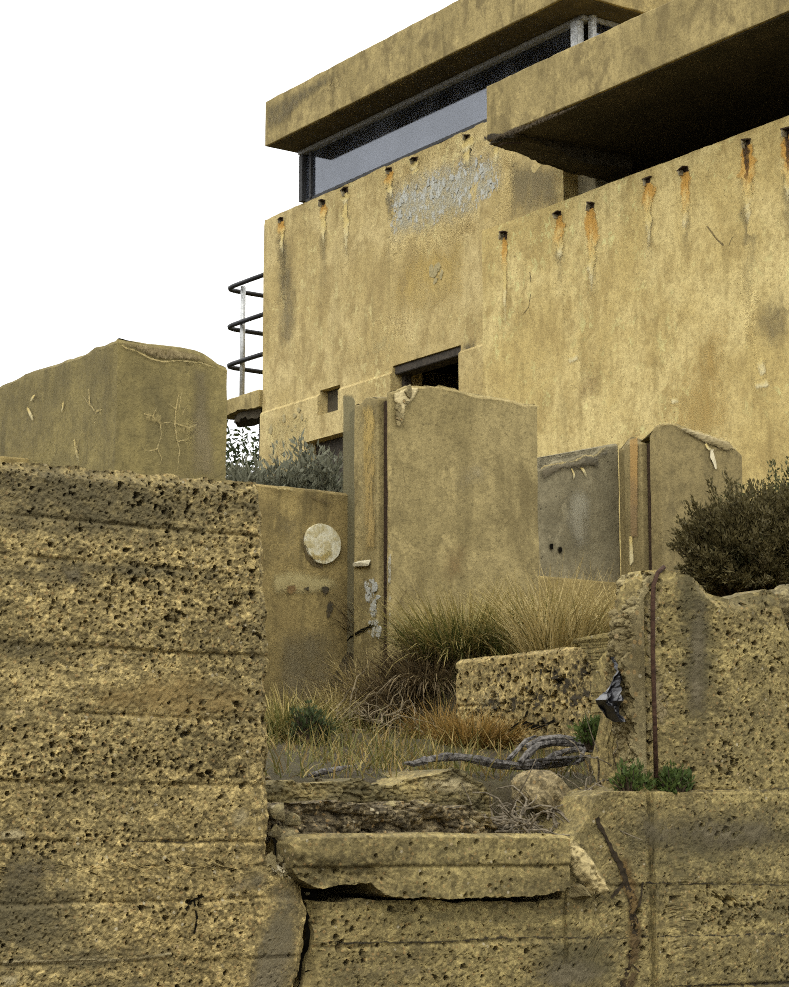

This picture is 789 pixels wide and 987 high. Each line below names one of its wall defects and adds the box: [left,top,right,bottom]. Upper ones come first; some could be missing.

peeling [390,155,498,231]
rust [737,144,757,219]
rust [780,135,789,196]
rust [584,208,600,283]
crack [144,394,195,462]
spalling [394,385,539,426]
spalling [541,448,608,479]
spalling [770,584,789,630]
crack [267,803,301,856]
crack [297,817,789,987]